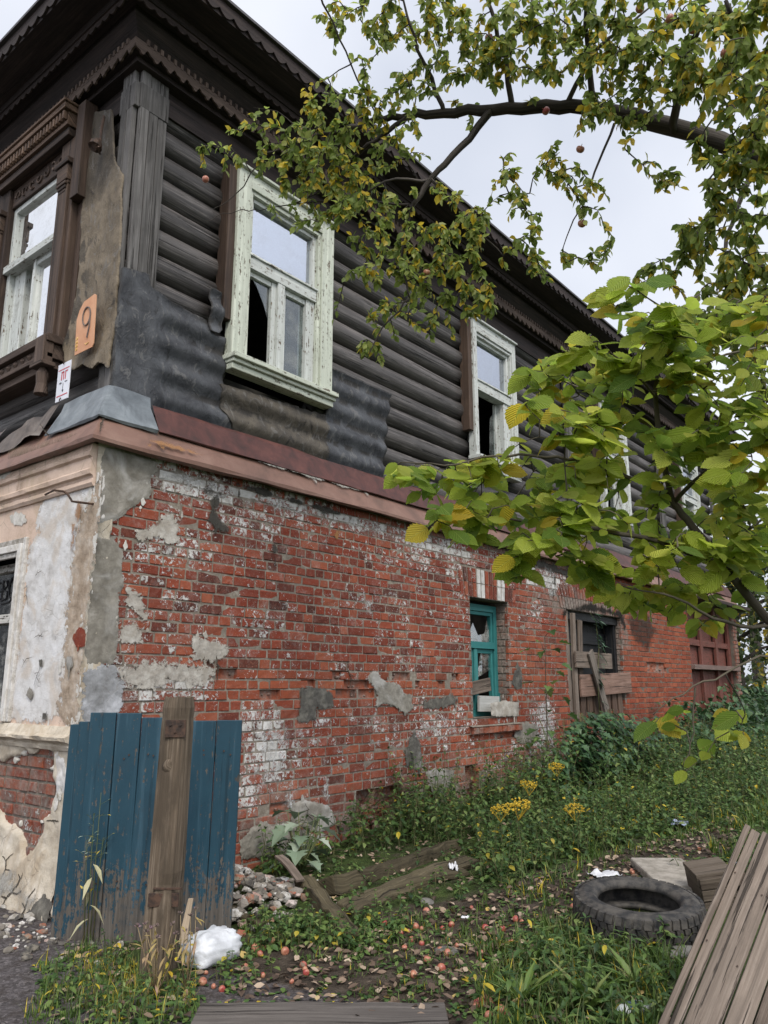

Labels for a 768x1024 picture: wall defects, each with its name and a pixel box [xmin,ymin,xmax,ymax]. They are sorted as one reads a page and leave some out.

damp [182,475,340,534]
peeling [9,447,158,726]
peeling [40,752,66,823]
crack [1,854,35,914]